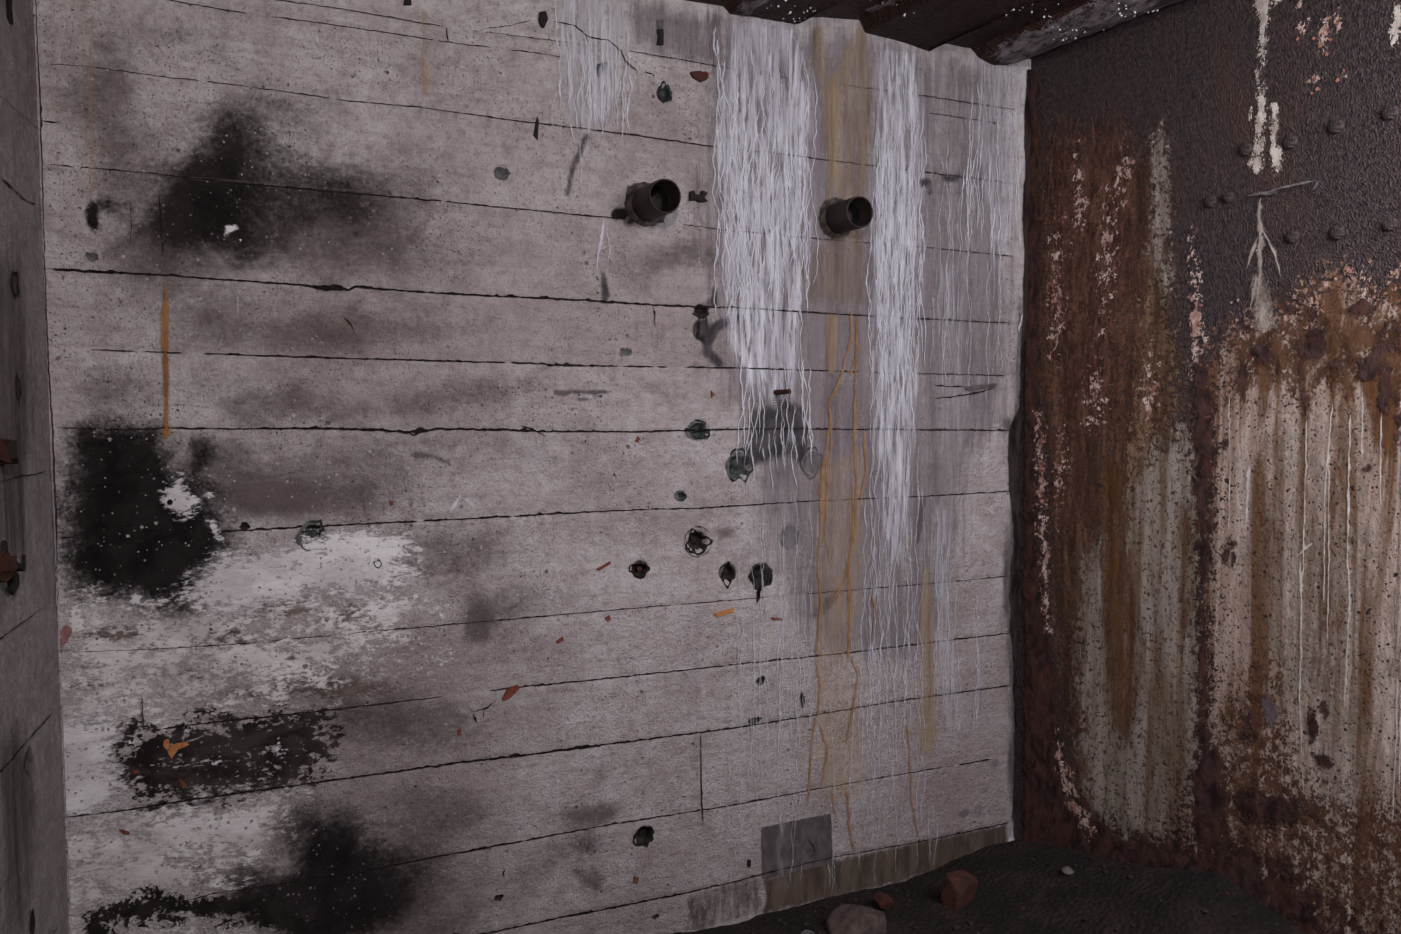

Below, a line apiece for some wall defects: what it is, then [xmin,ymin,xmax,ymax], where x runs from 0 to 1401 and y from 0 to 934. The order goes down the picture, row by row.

leakage [1247,0,1283,176]
leakage [1388,3,1401,46]
rust [161,292,170,438]
rust [807,229,867,851]
leakage [551,0,1183,657]
peeling [1008,69,1401,934]
rust [1020,72,1401,934]
leakage [1228,465,1250,531]
leakage [1246,198,1282,327]
leakage [1299,404,1333,753]
leakage [1344,390,1364,709]
leakage [1392,506,1401,821]